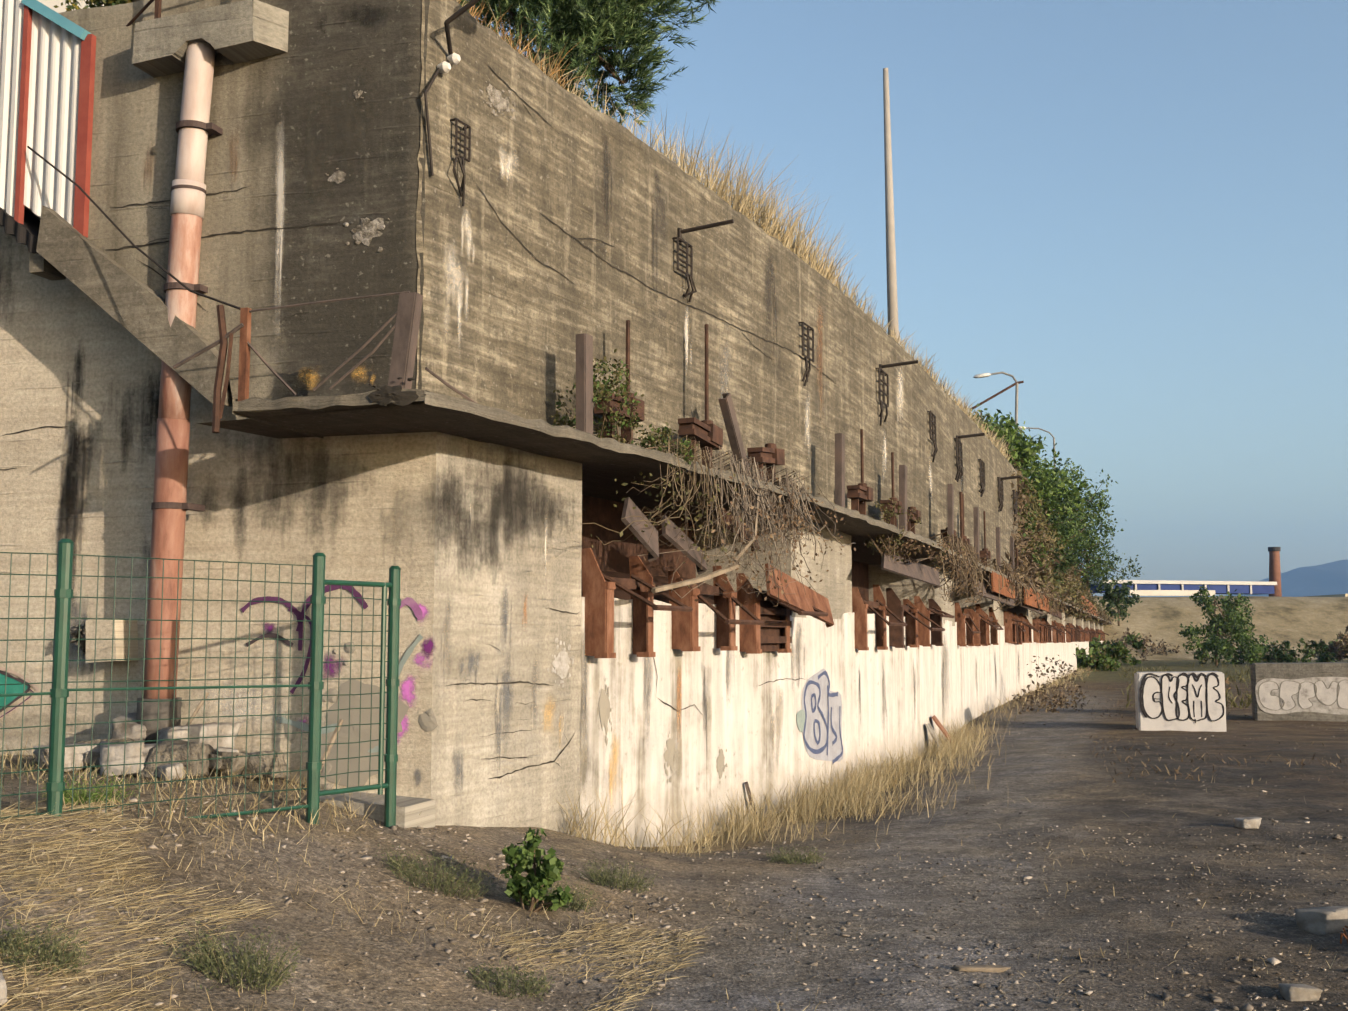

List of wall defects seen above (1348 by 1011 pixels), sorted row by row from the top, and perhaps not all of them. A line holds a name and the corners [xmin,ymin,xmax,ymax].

spalling [343,217,390,253]
water stain [67,355,81,408]
water stain [58,428,90,559]
water stain [431,476,519,554]
crack [447,644,575,779]